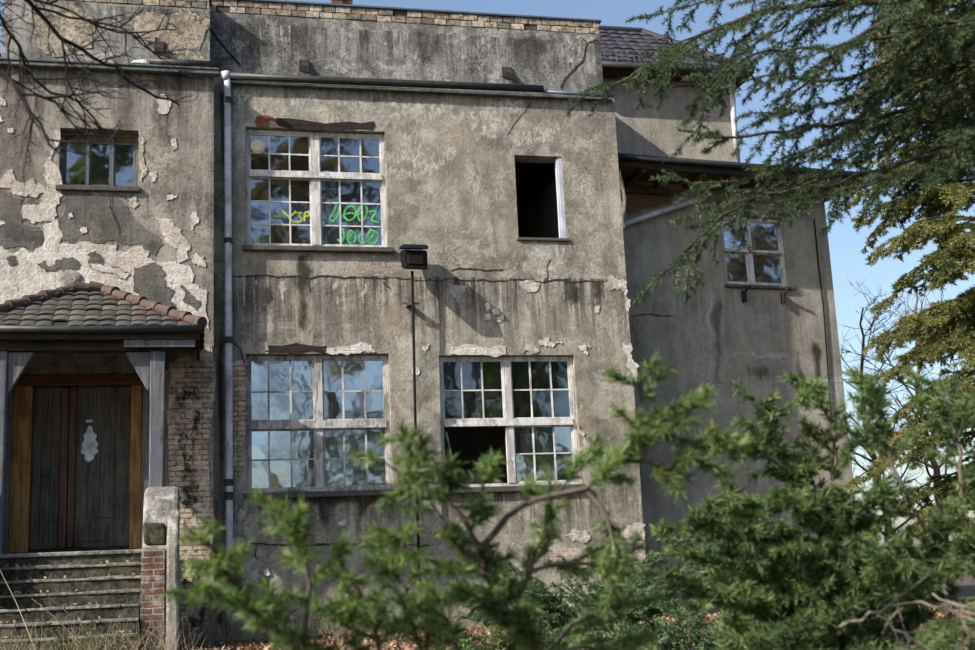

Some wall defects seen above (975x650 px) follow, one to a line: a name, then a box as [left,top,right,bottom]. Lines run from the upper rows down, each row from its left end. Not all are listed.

flaking render [24,3,95,57]
flaking render [131,8,210,61]
crack [560,38,597,88]
flaking render [156,94,172,114]
rust [255,115,277,128]
flaking render [0,130,209,329]
leakage [287,255,311,327]
crack [232,259,628,303]
flaking render [485,302,504,322]
leakage [567,279,578,303]
flaking render [623,343,639,381]